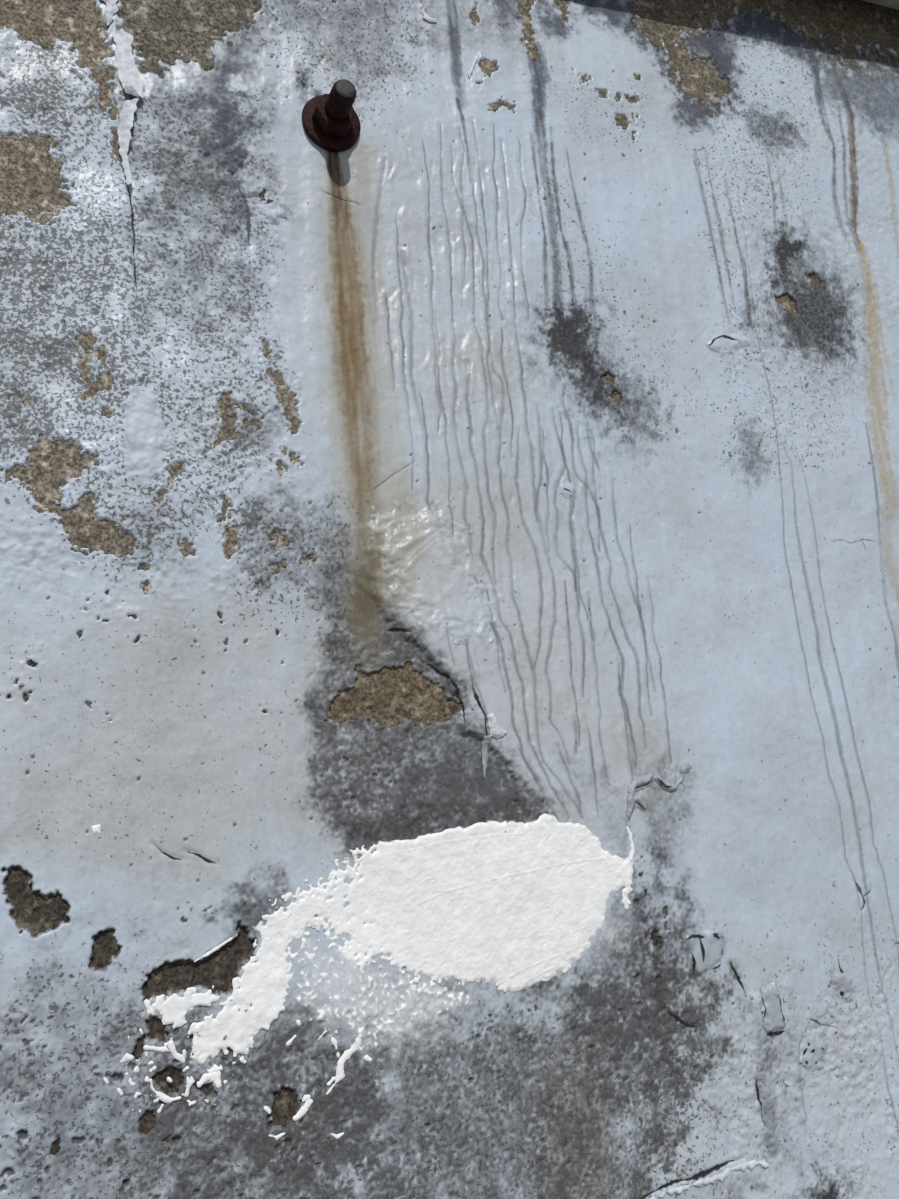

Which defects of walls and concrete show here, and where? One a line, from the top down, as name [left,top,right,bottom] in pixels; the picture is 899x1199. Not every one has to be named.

water stain [581,0,636,34]
peeling [0,0,262,166]
crack [128,187,137,297]
corrosion [328,151,373,518]
water stain [529,43,639,422]
water stain [772,222,852,359]
corrosion [843,87,890,496]
corrosion [348,544,387,641]
crack [425,663,488,736]
spalling [2,866,69,936]
spalling [142,925,255,1002]
crack [640,1157,770,1199]